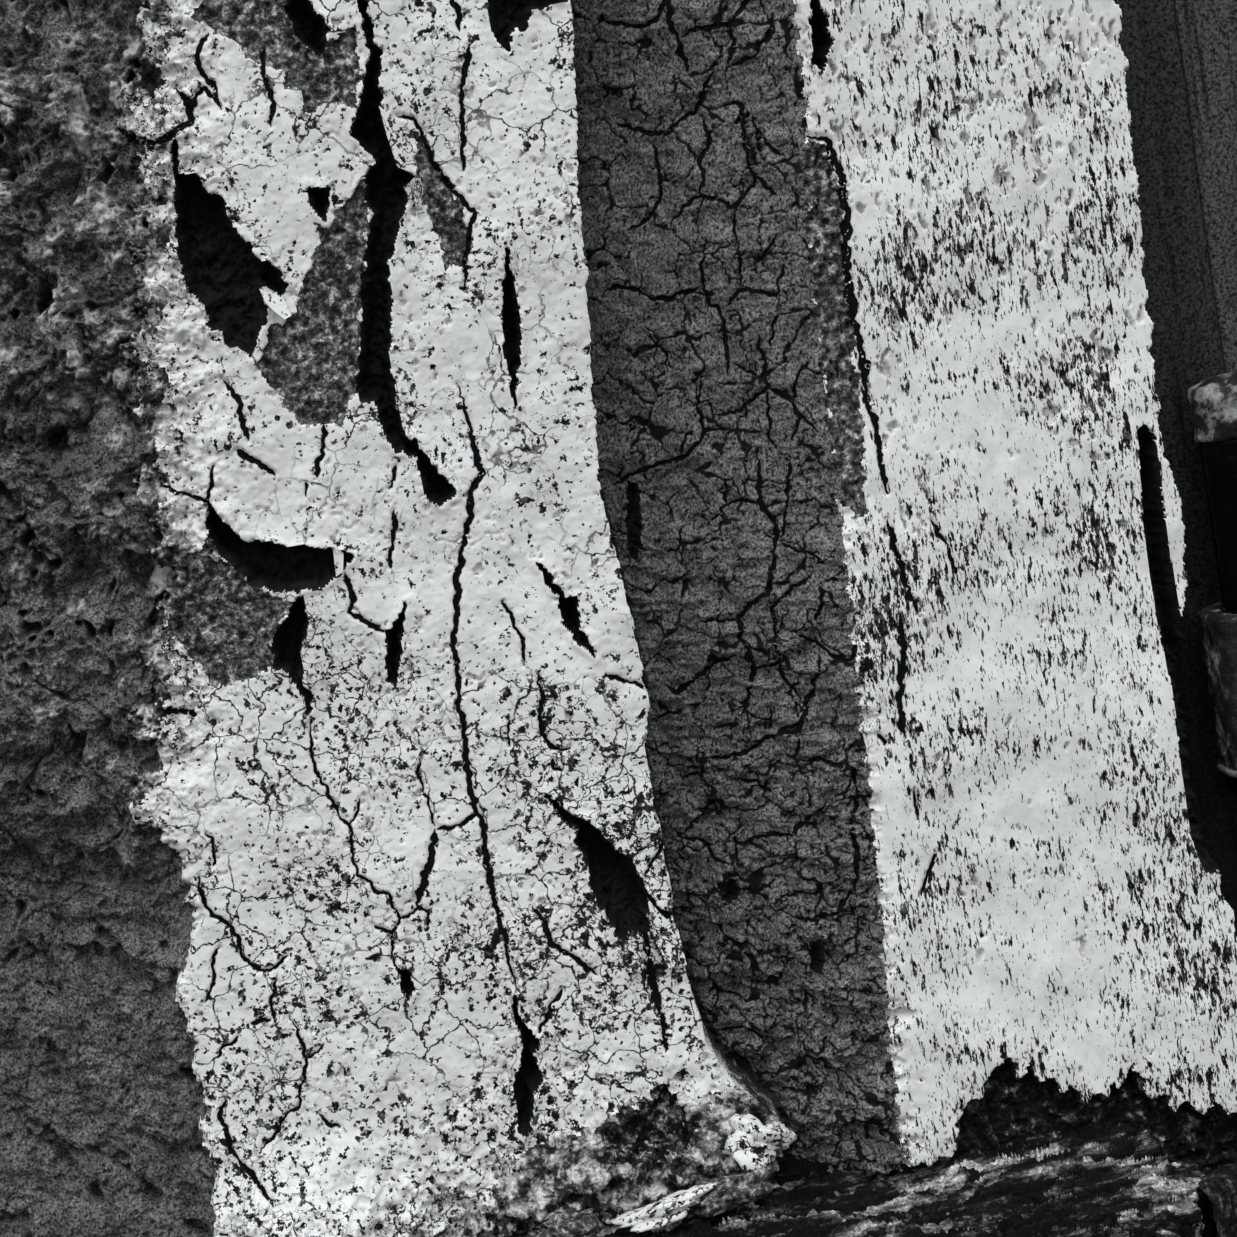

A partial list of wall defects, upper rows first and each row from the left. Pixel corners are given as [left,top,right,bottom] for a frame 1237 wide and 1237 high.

crack [117,33,222,146]
crack [160,380,275,503]
peeling [111,0,474,507]
crack [396,0,477,293]
spalling [501,242,523,408]
spalling [487,0,568,52]
crack [599,0,920,923]
peeling [120,459,354,843]
crack [309,385,519,991]
crack [197,832,341,1207]
spalling [544,794,687,975]
spalling [884,1057,1237,1175]